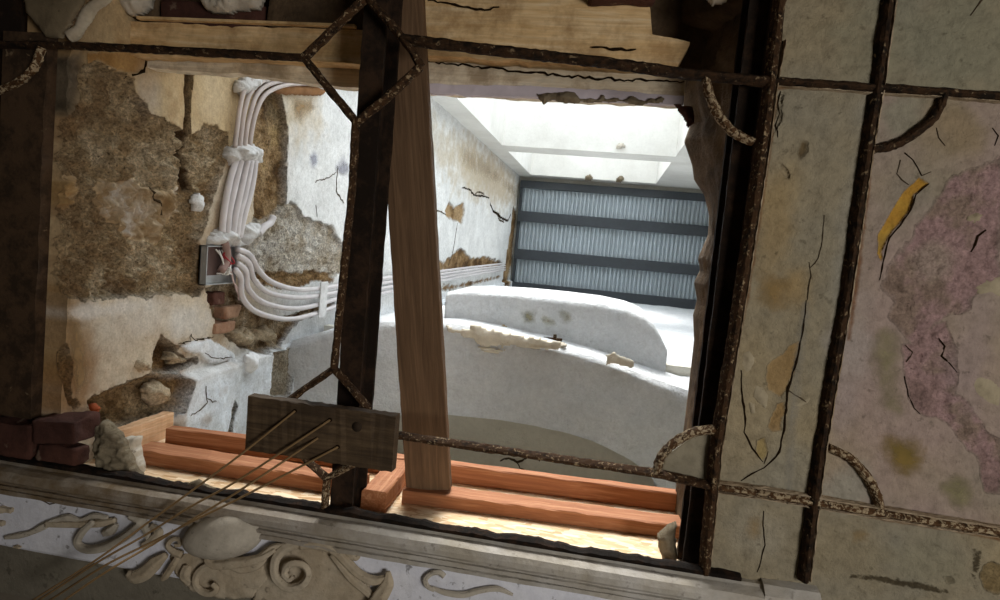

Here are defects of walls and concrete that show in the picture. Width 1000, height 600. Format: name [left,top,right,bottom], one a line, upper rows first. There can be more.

crack [428,61,684,83]
spalling [537,91,695,128]
spalling [51,51,342,397]
crack [316,166,344,203]
spalling [439,207,517,292]
crack [463,187,511,223]
spalling [56,334,199,427]
crack [741,215,825,481]
crack [904,345,920,414]
peeling [877,155,1000,495]
crack [938,338,957,372]
crack [757,511,766,572]